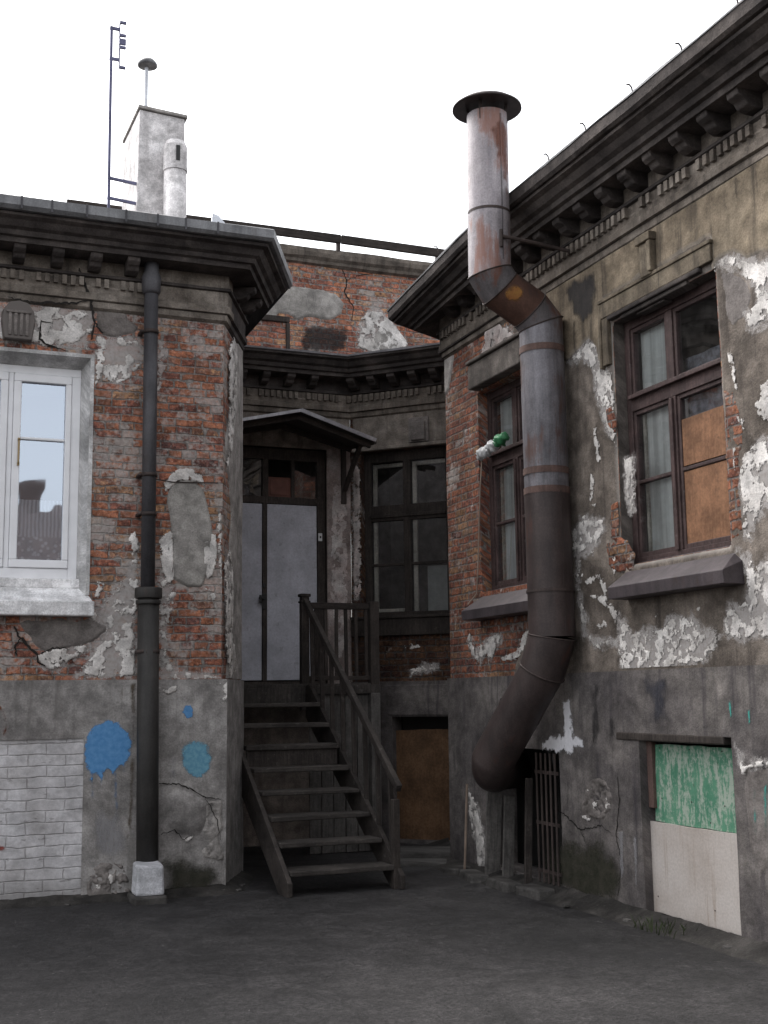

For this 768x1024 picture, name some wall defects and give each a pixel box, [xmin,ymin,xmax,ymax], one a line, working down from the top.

rust [492,122,507,179]
flaking render [31,306,144,384]
crack [342,270,372,318]
flaking render [357,309,408,351]
rust [506,286,522,301]
flaking render [567,340,617,462]
flaking render [572,351,768,668]
flaking render [38,532,140,679]
flaking render [159,513,237,703]
crack [159,783,221,840]
flaking render [468,792,485,866]
crack [549,777,624,893]